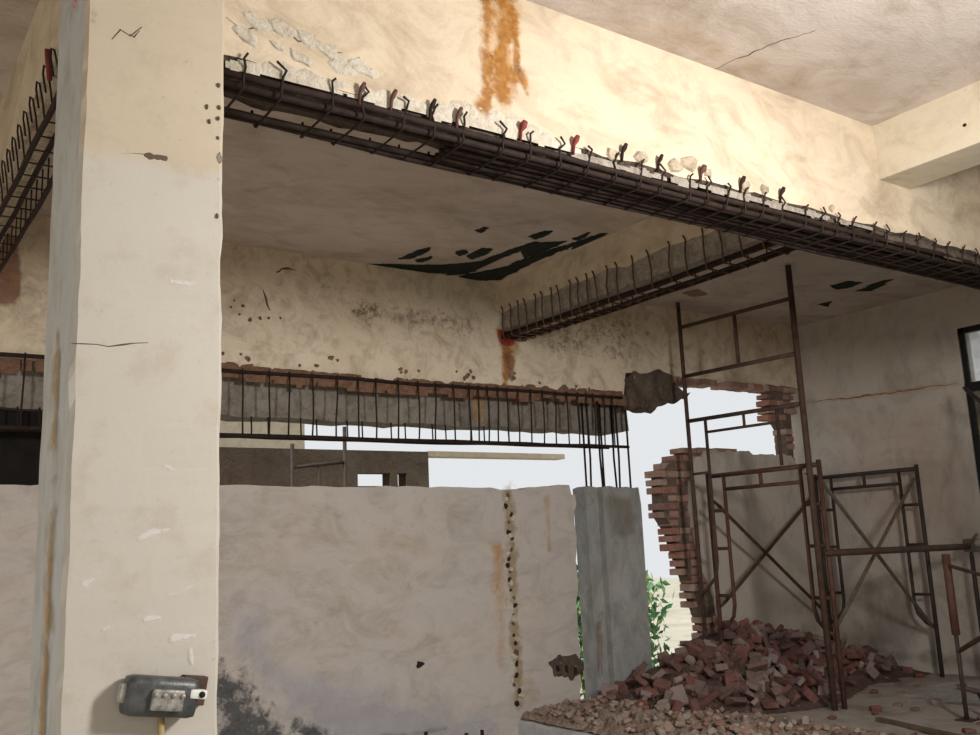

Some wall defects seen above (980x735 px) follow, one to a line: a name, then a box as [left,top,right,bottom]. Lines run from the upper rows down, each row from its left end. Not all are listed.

crack [112,27,142,39]
corrosion [477,0,528,112]
spalling [0,90,57,273]
spalling [205,11,980,340]
spalling [0,352,45,374]
crack [71,340,149,348]
spalling [221,352,690,414]
corrosion [497,330,519,386]
leakage [217,670,281,735]
leakage [292,719,326,735]